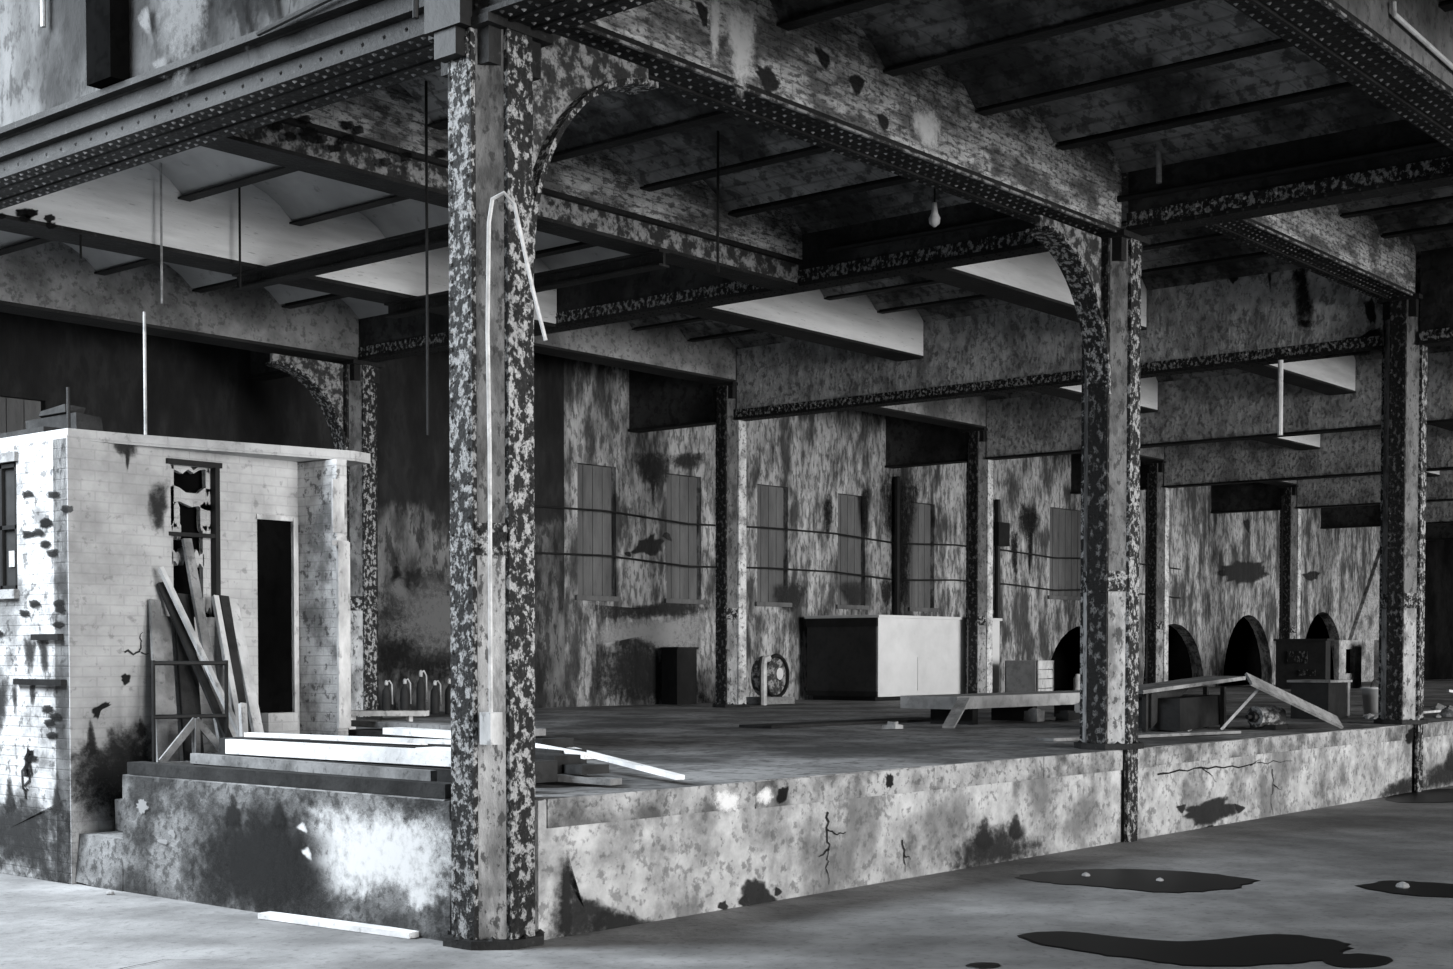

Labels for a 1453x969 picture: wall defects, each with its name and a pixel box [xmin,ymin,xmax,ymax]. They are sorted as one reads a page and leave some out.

peeling [696,0,720,58]
spalling [756,66,781,95]
spalling [849,75,865,95]
spalling [878,114,889,130]
peeling [913,111,940,148]
spalling [22,490,73,557]
spalling [19,599,66,628]
spalling [42,705,61,739]
damp [0,719,152,883]
damp [955,815,1041,868]
damp [549,861,649,939]
spalling [718,879,782,910]